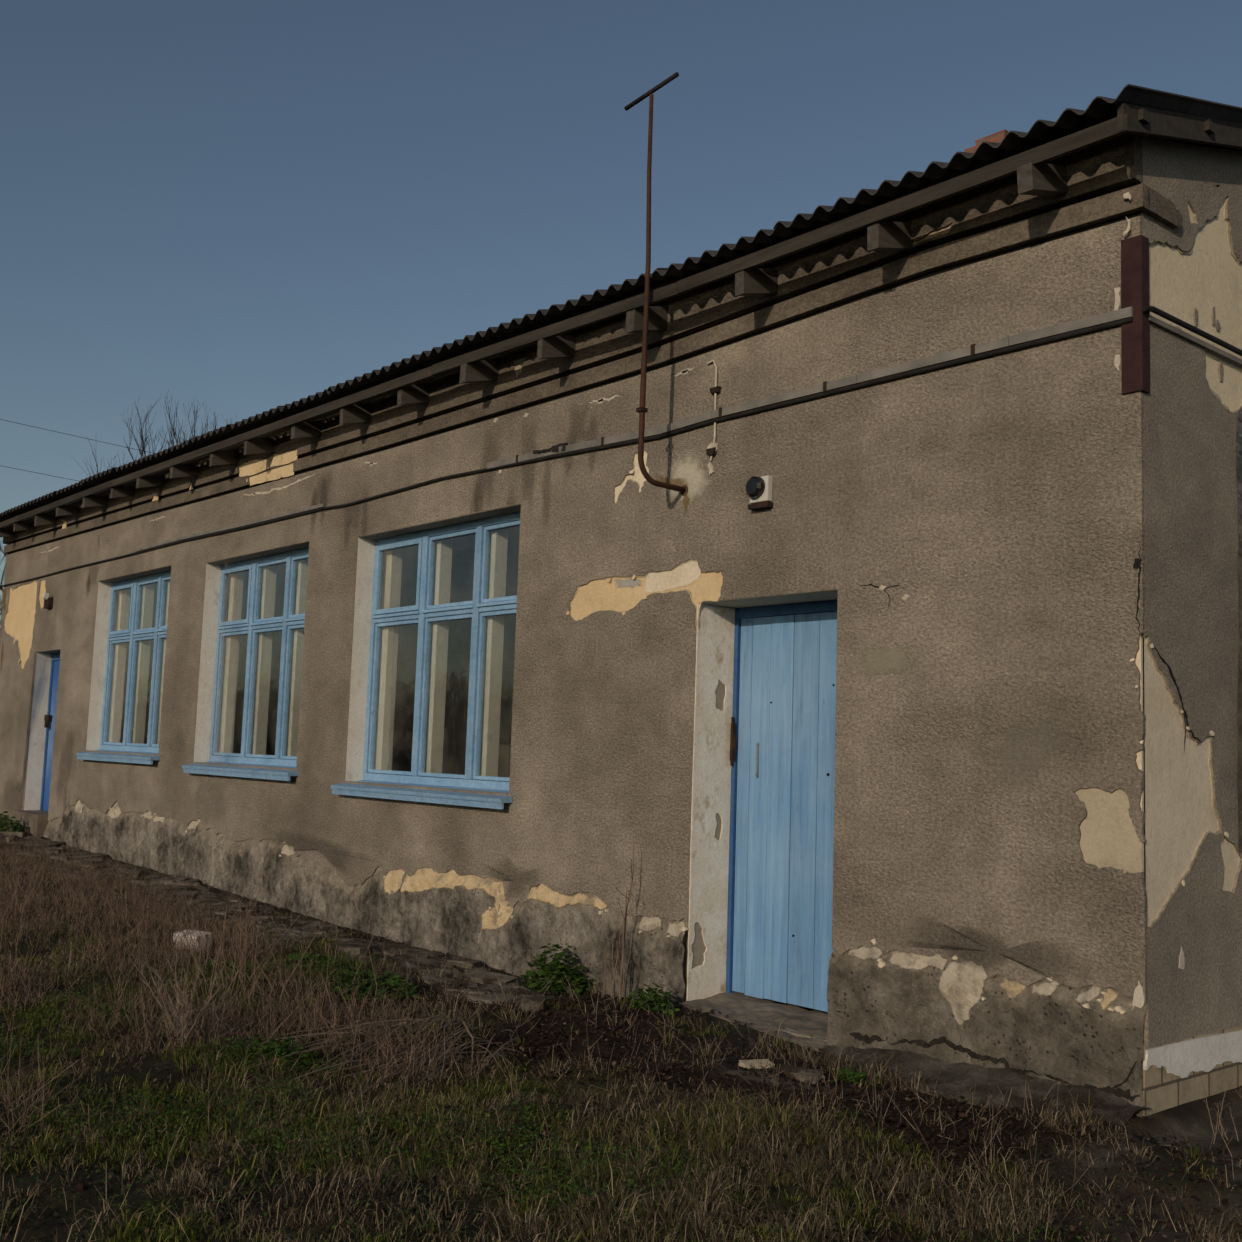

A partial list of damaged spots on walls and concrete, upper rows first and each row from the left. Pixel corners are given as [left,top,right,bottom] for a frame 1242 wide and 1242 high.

flaking render [1149,185,1242,413]
flaking render [239,449,314,496]
flaking render [614,450,649,503]
flaking render [4,580,46,669]
flaking render [566,559,723,629]
crack [1133,547,1202,747]
flaking render [107,802,121,819]
flaking render [1074,633,1241,927]
flaking render [279,841,295,857]
flaking render [848,939,988,1025]
flaking render [1000,977,1060,999]
flaking render [1075,980,1144,1014]